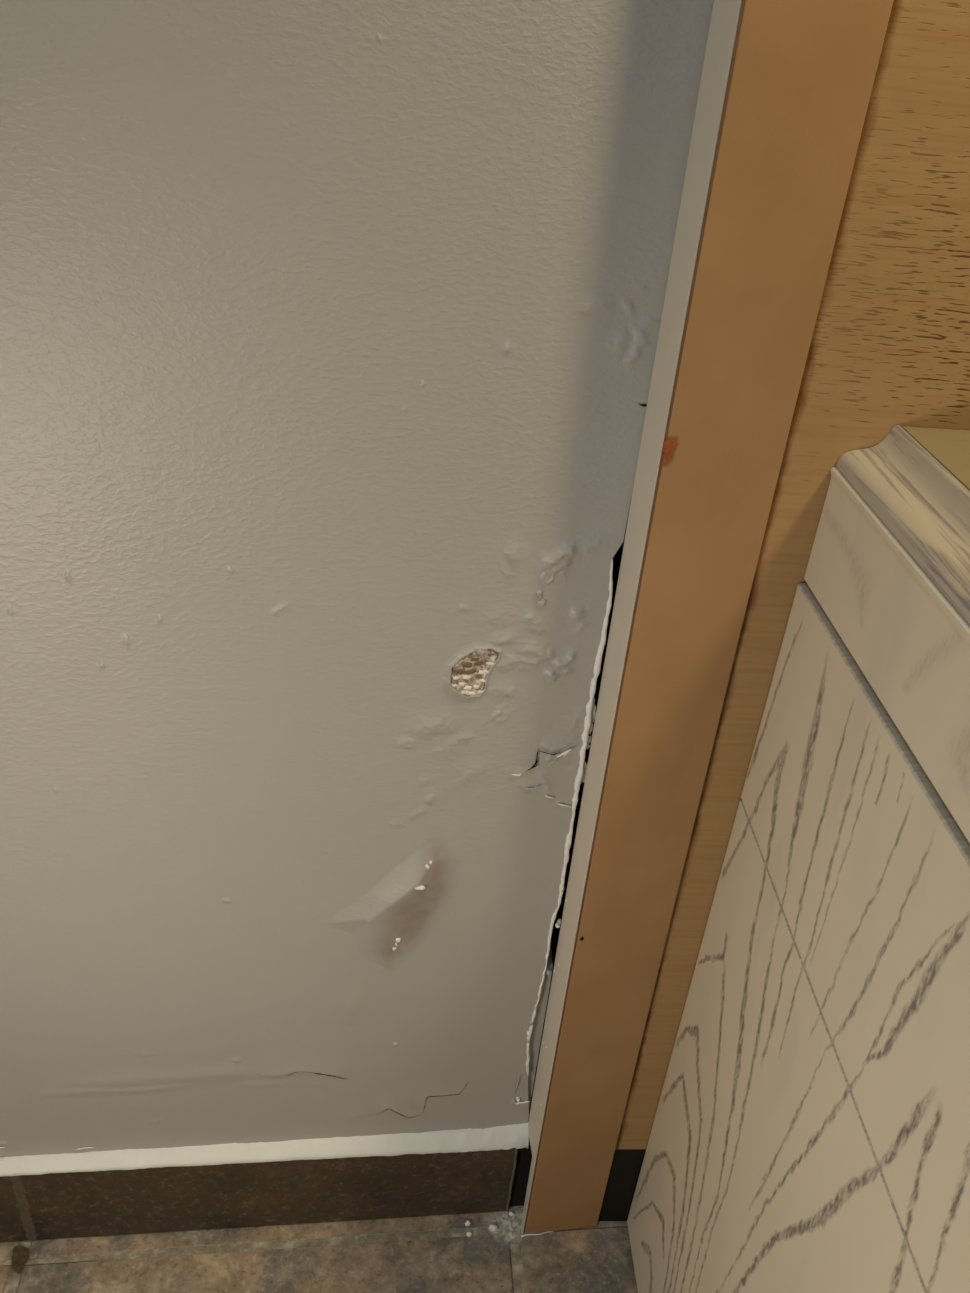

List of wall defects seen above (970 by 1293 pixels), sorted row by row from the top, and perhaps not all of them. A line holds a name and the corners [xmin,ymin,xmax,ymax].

spalling [441,641,506,703]
crack [511,559,613,1109]